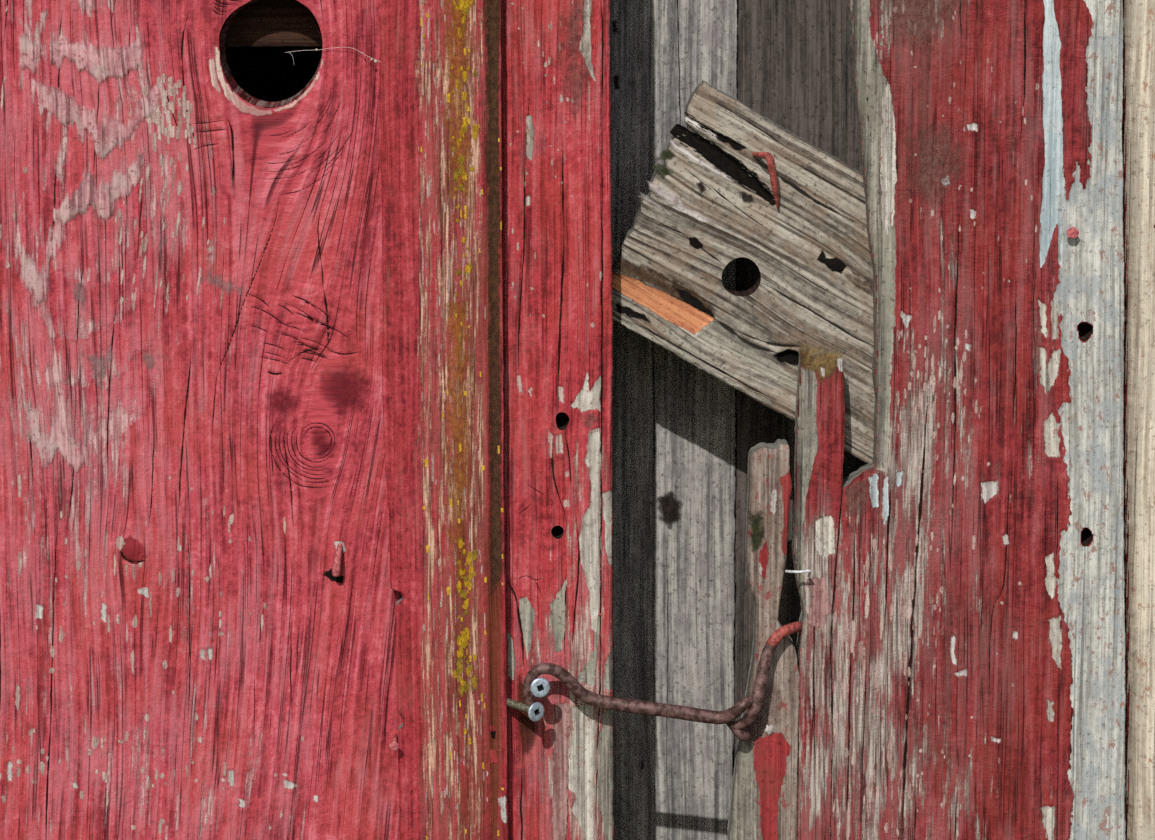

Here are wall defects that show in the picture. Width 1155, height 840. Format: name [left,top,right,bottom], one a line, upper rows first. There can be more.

peeling [538,0,600,104]
peeling [509,115,534,206]
spalling [850,0,982,528]
peeling [558,374,601,412]
peeling [1025,0,1155,840]
peeling [578,428,613,690]
spalling [774,349,967,736]
peeling [981,481,1011,503]
peeling [507,597,535,680]
peeling [552,703,614,840]
spalling [729,741,756,840]
peeling [833,734,924,840]